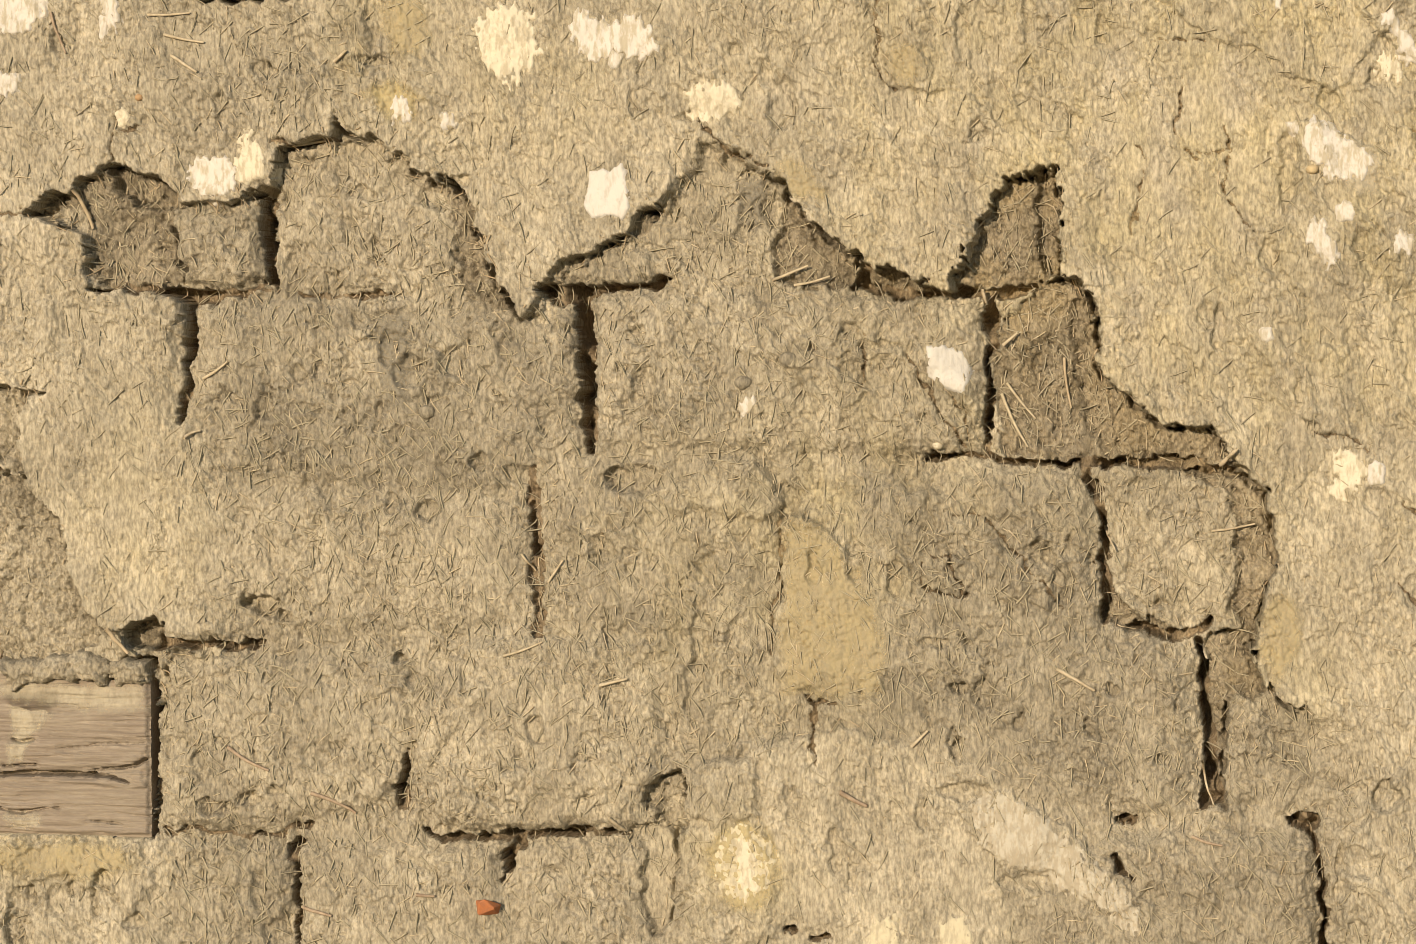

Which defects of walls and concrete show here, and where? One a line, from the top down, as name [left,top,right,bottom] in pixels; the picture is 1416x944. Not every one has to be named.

spalling [39,129,283,291]
spalling [423,175,518,317]
peeling [584,163,663,239]
crack [537,275,673,456]
peeling [737,395,757,419]
spalling [0,385,104,661]
spalling [771,166,1279,811]
spalling [125,618,167,650]
crack [1287,811,1331,944]